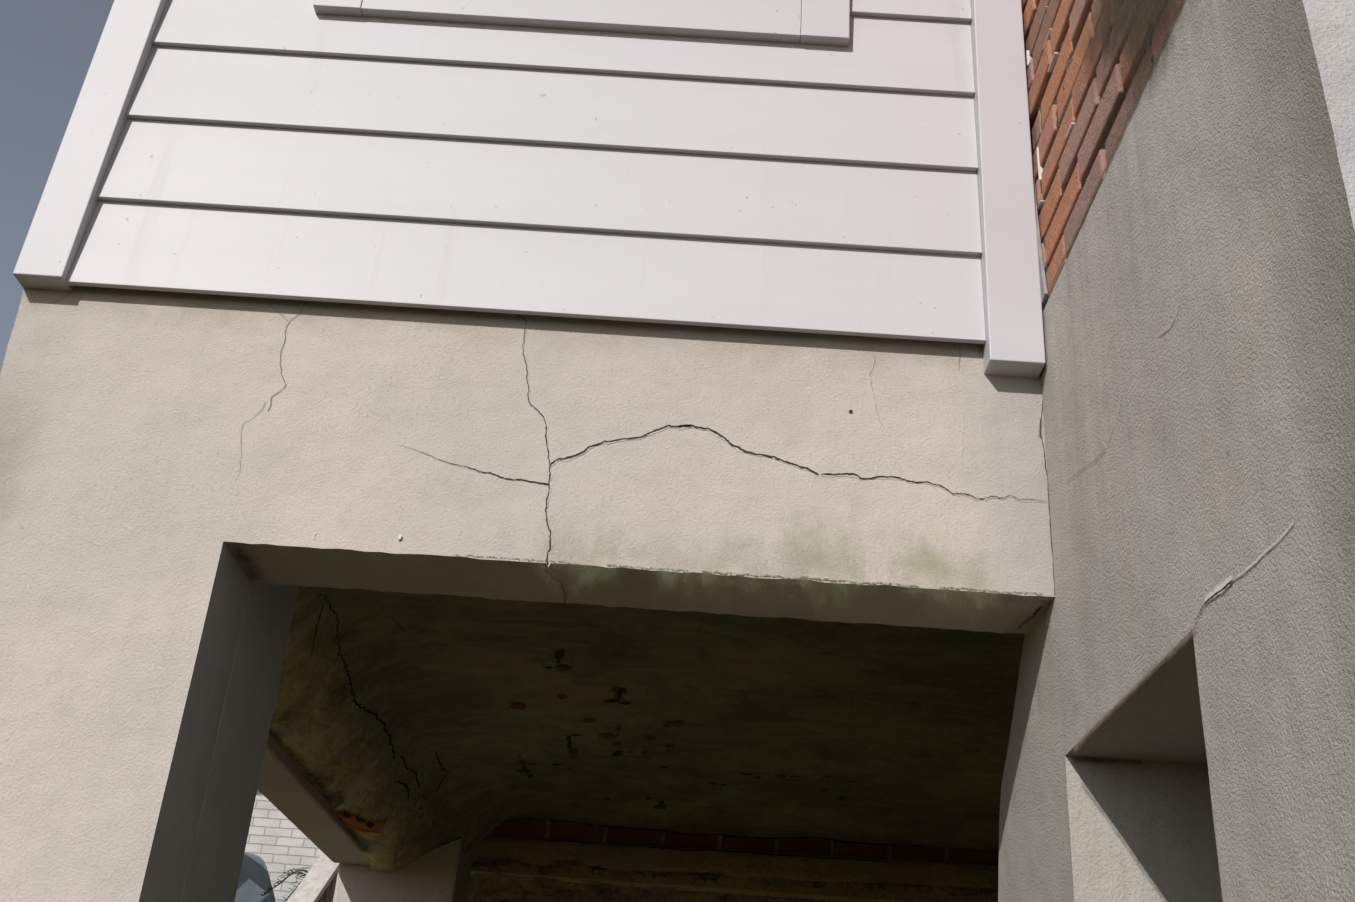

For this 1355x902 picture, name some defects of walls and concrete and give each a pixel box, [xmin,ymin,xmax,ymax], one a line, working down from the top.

crack [238,301,307,476]
crack [402,313,1055,605]
crack [1195,522,1294,625]
crack [311,594,464,812]